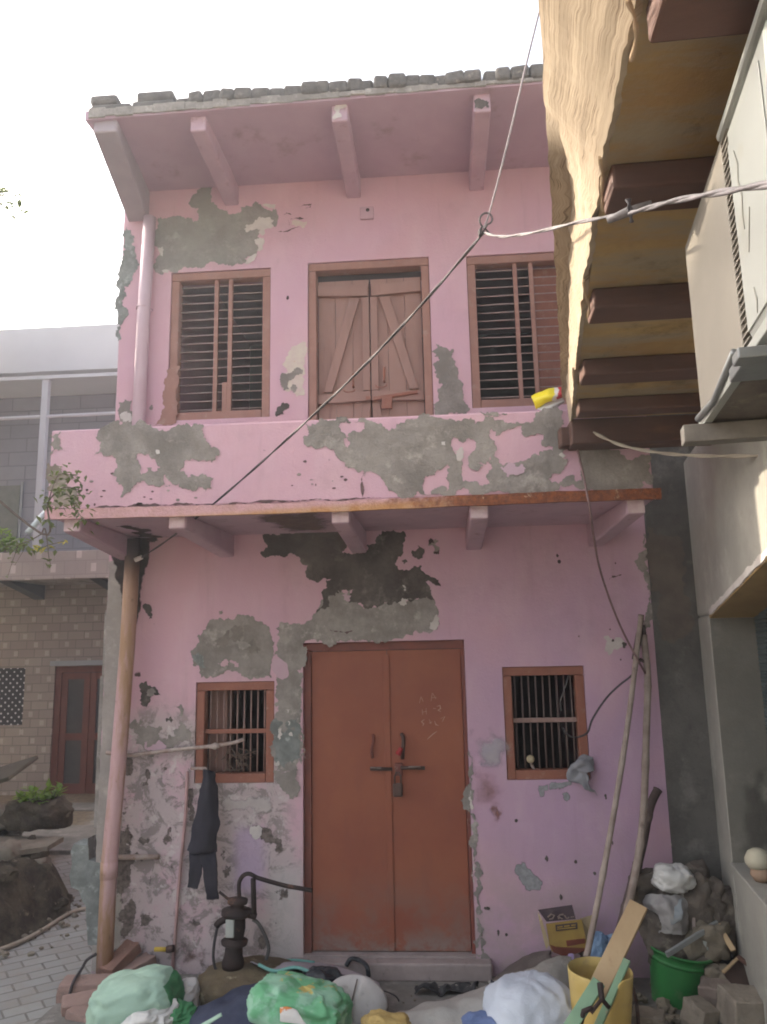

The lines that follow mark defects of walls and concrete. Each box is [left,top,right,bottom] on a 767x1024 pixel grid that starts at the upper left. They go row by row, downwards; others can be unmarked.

peeling [114,227,140,341]
flaking render [153,187,278,275]
peeling [95,366,220,498]
peeling [279,342,308,396]
peeling [303,343,653,498]
flaking render [190,530,441,799]
peeling [129,704,192,786]
peeling [461,751,490,959]